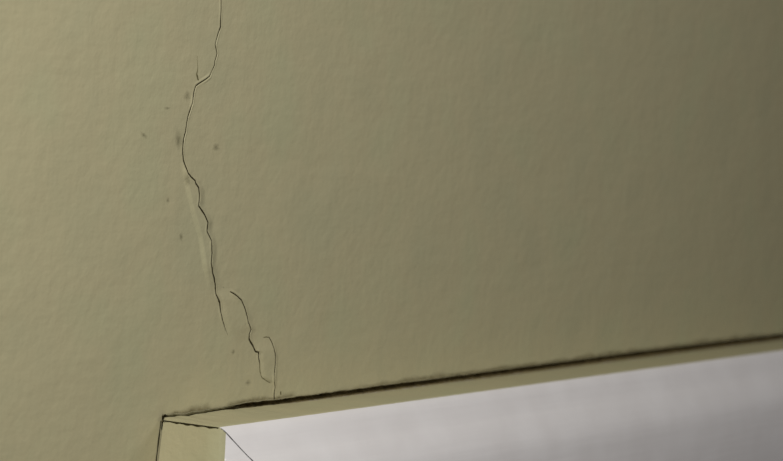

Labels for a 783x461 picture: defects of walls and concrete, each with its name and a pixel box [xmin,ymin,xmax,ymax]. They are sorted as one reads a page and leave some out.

crack [181,0,230,338]
crack [156,288,783,461]